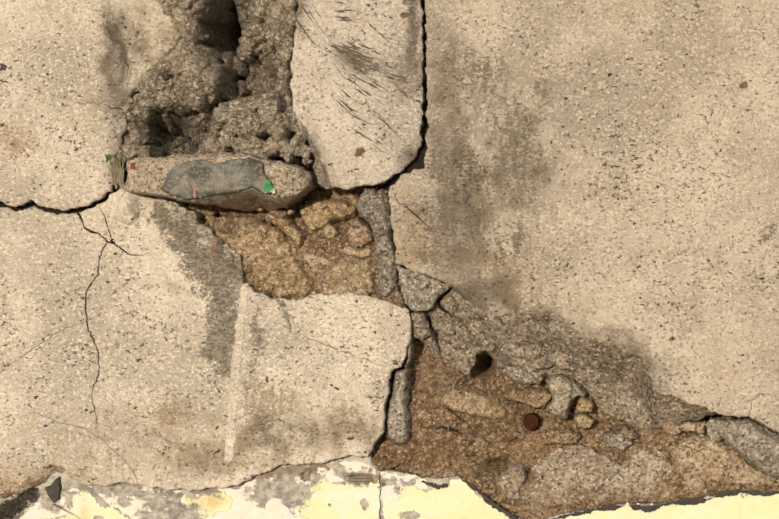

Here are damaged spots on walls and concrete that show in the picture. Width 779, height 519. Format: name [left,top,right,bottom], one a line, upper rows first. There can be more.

spalling [117,0,315,170]
water stain [403,0,420,68]
crack [386,0,452,355]
water stain [417,43,542,278]
crack [0,184,150,481]
spalling [89,179,779,519]
peeling [14,476,80,519]